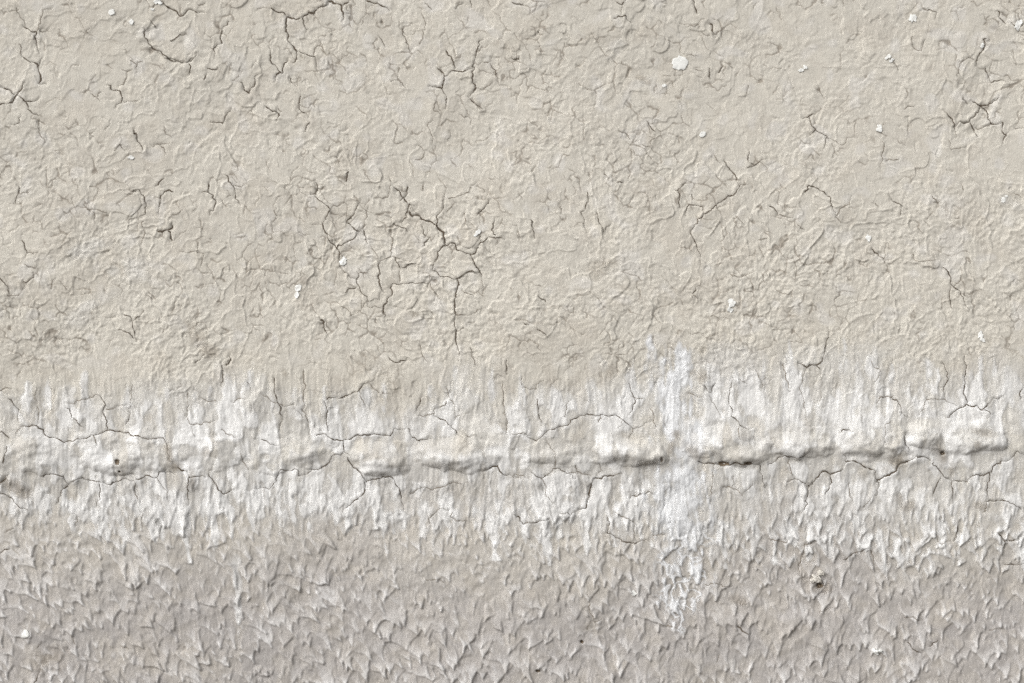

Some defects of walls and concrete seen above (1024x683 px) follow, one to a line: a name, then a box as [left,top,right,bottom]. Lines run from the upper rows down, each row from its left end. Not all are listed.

crack [0,7,74,142]
crack [688,0,724,78]
crack [946,11,1022,149]
crack [0,240,67,297]
crack [84,0,534,365]
crack [677,153,766,298]
crack [805,185,901,221]
crack [913,254,974,309]
crack [0,386,230,553]
crack [186,344,667,544]
damp [0,336,1024,632]
crack [688,335,1023,513]